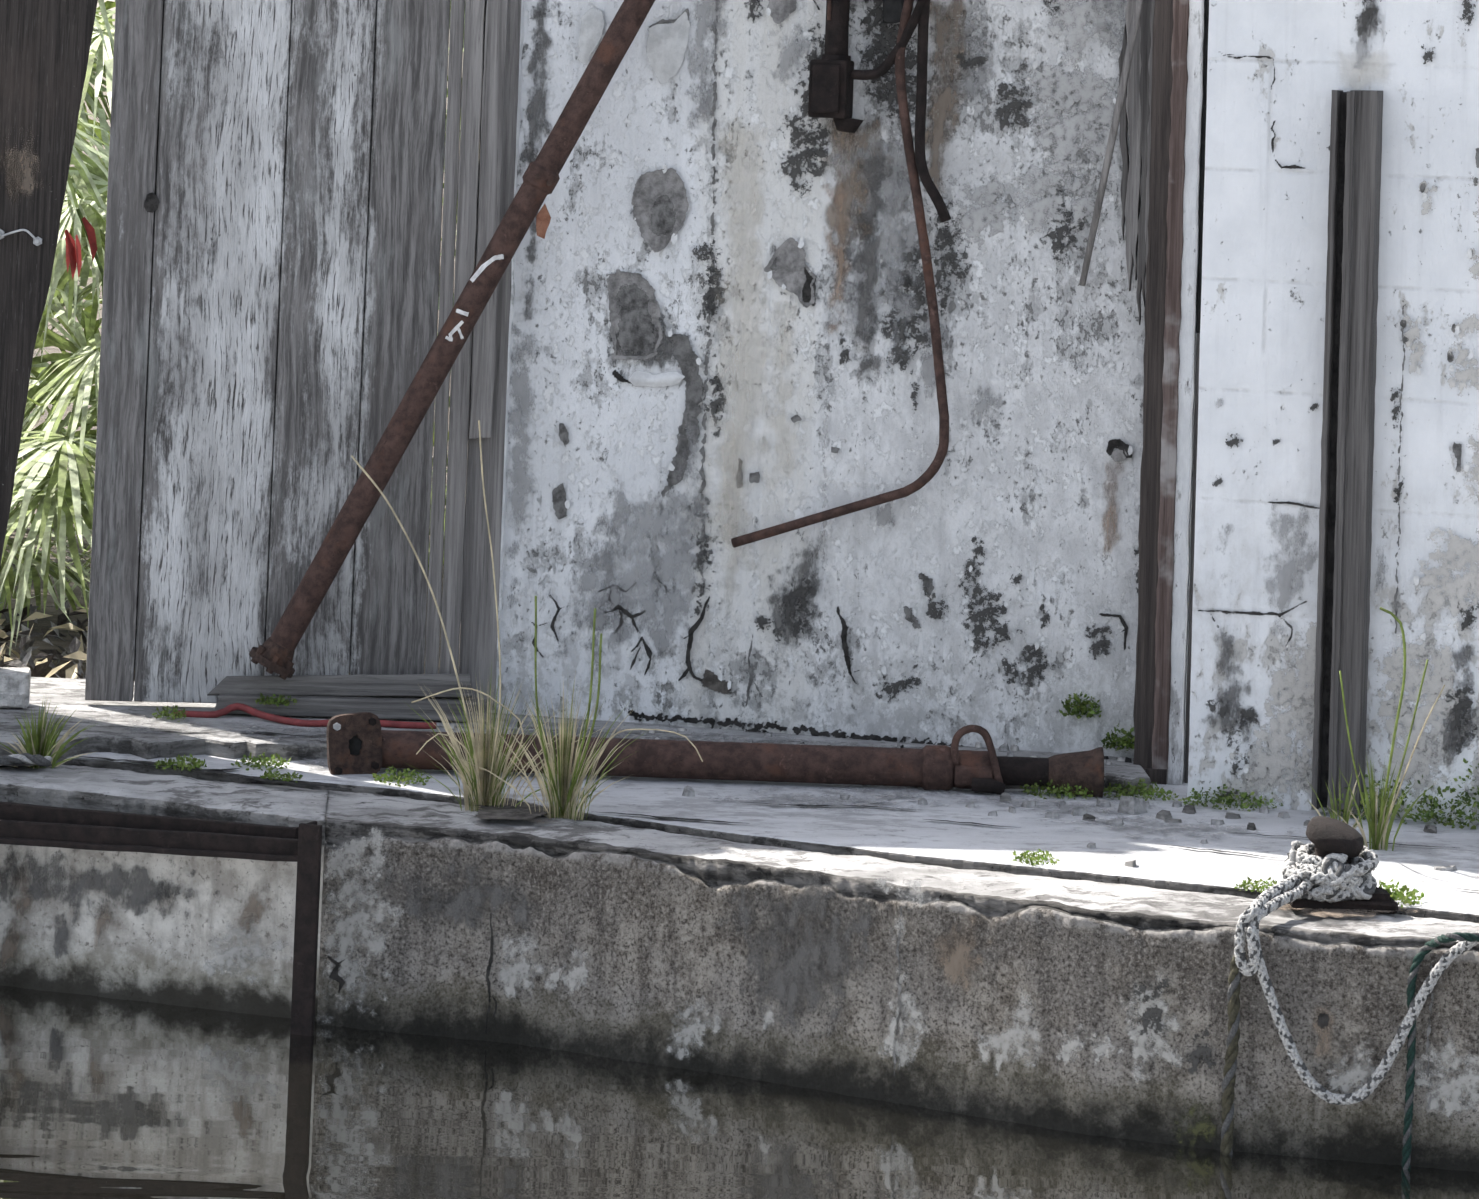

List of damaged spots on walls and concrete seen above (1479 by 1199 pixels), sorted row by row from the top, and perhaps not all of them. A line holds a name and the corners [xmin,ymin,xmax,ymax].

spalling [632,165,689,252]
spalling [764,237,816,308]
spalling [605,269,703,547]
crack [598,0,964,747]
crack [531,595,562,657]
water stain [923,536,1050,705]
crack [1198,601,1307,644]
peeling [1371,527,1479,808]
crack [485,913,497,1033]
water stain [667,1003,720,1059]
water stain [879,975,923,1066]
water stain [1415,1043,1479,1115]